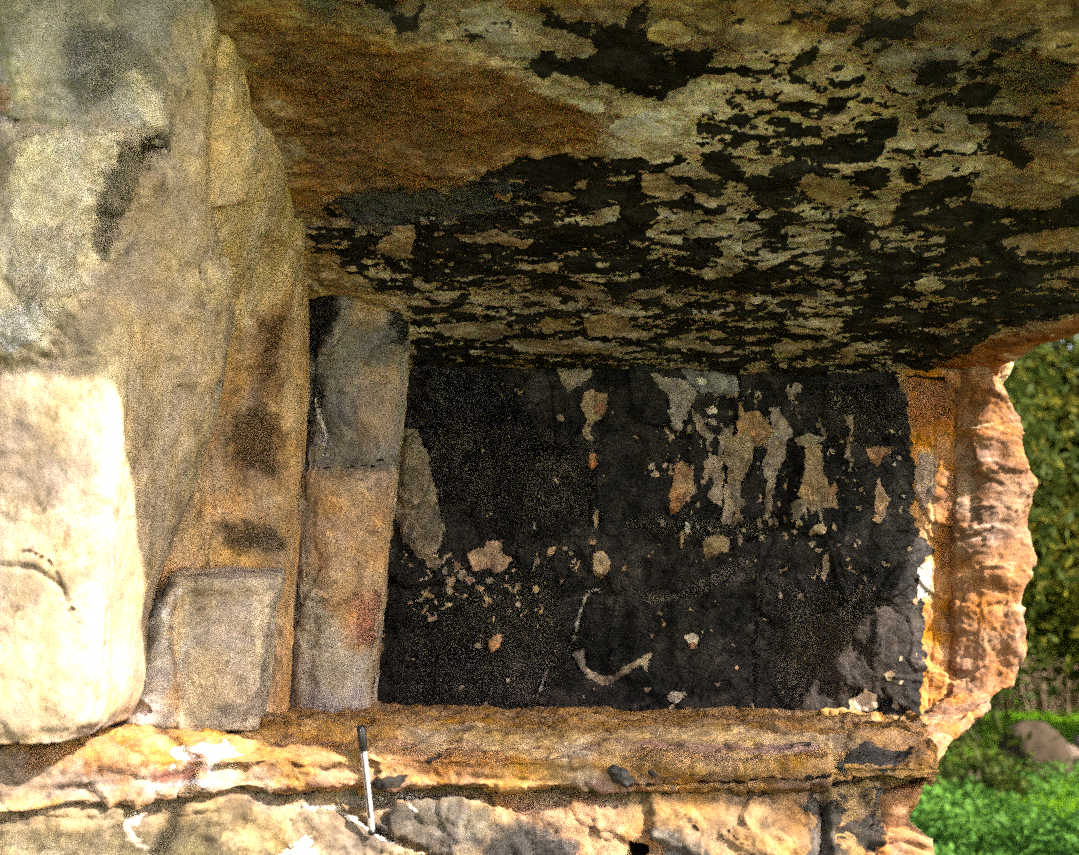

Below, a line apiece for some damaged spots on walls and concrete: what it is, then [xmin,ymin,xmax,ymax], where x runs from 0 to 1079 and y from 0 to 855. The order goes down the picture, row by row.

peeling [459,0,541,59]
peeling [528,82,719,199]
peeling [376,224,417,259]
peeling [433,313,736,476]
peeling [644,368,938,605]
peeling [395,428,546,653]
peeling [590,509,627,578]
peeling [569,646,652,698]
peeling [849,689,878,712]
water stain [279,835,318,855]
water stain [298,802,396,843]
water stain [375,793,417,812]